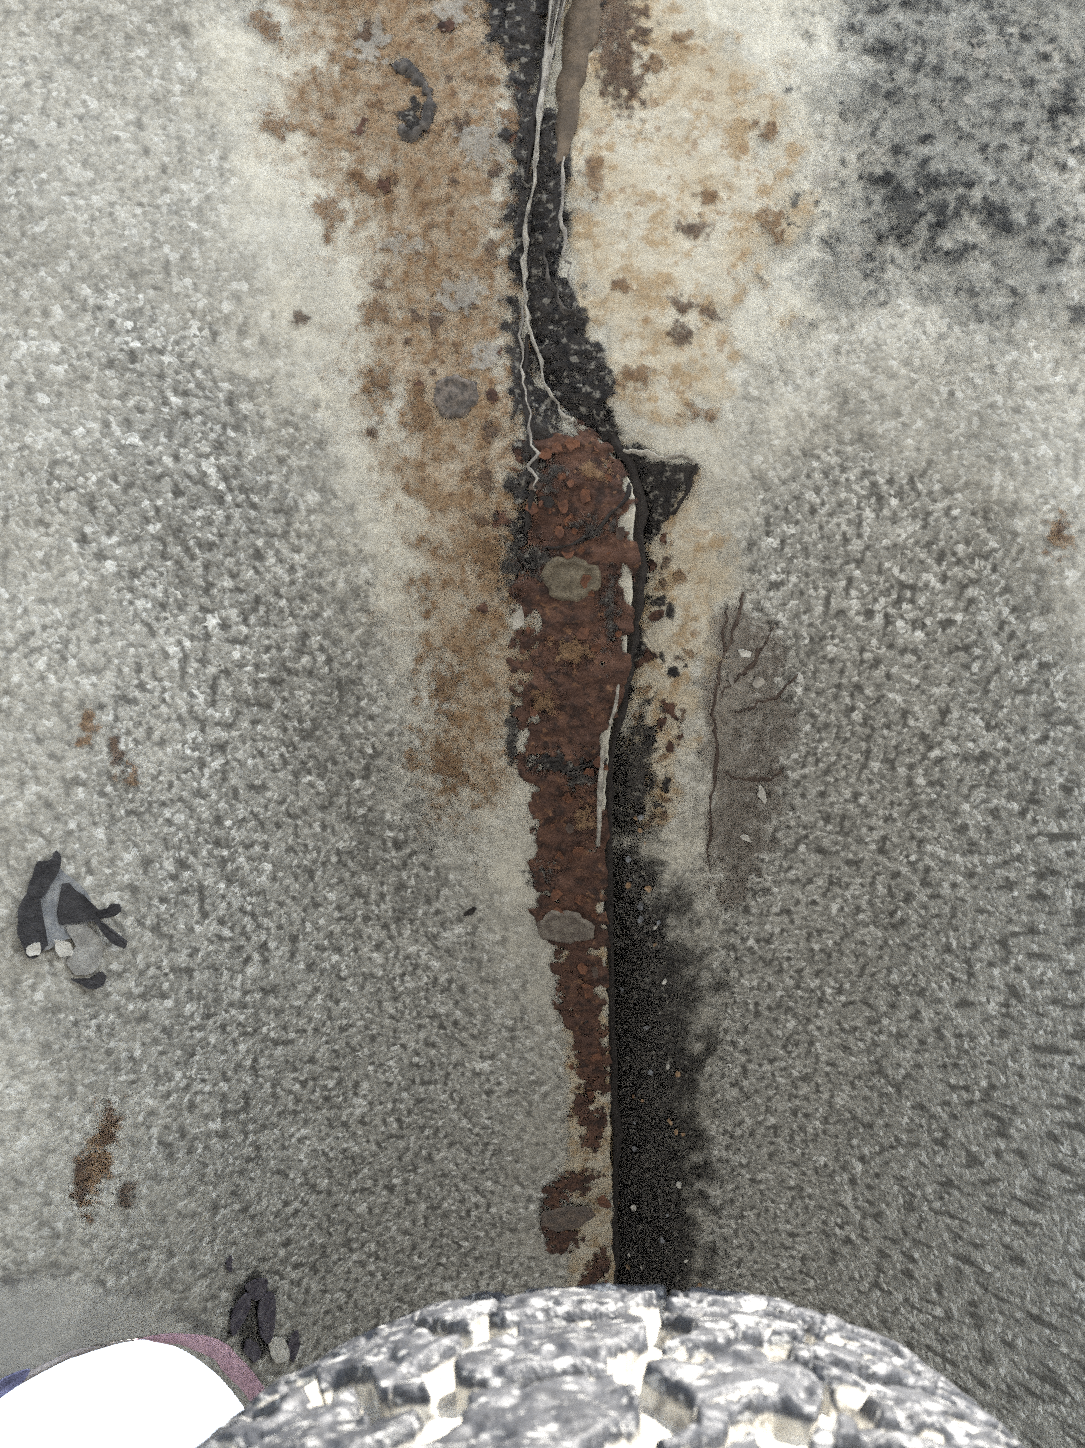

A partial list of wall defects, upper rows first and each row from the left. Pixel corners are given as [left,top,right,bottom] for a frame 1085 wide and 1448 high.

crack [523,45,545,181]
leakage [476,0,648,614]
corrosion [566,0,815,427]
peeling [17,850,128,989]
corrosion [248,0,738,1287]
crack [520,333,649,1284]
leakage [603,626,725,1297]